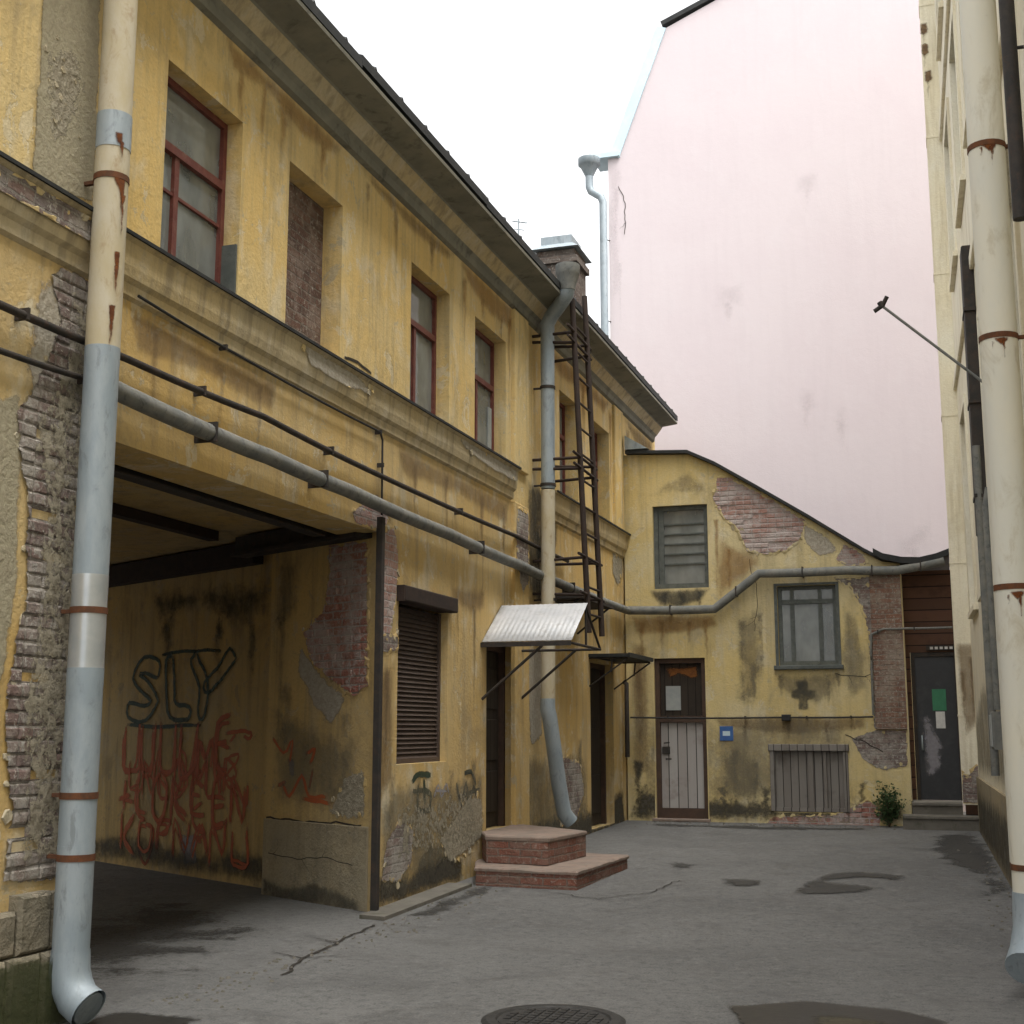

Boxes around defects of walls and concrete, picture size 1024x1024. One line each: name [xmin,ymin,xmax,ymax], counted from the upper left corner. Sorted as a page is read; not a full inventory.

rust [115,177,126,231]
flaking render [710,475,836,556]
flaking render [0,268,88,883]
flaking render [302,503,401,699]
damp [653,590,705,606]
flaking render [834,576,909,770]
peeling [330,769,367,819]
flaking render [563,755,584,817]
damp [529,754,901,835]
crack [269,848,353,868]
peeling [381,791,484,890]
crack [276,925,375,975]